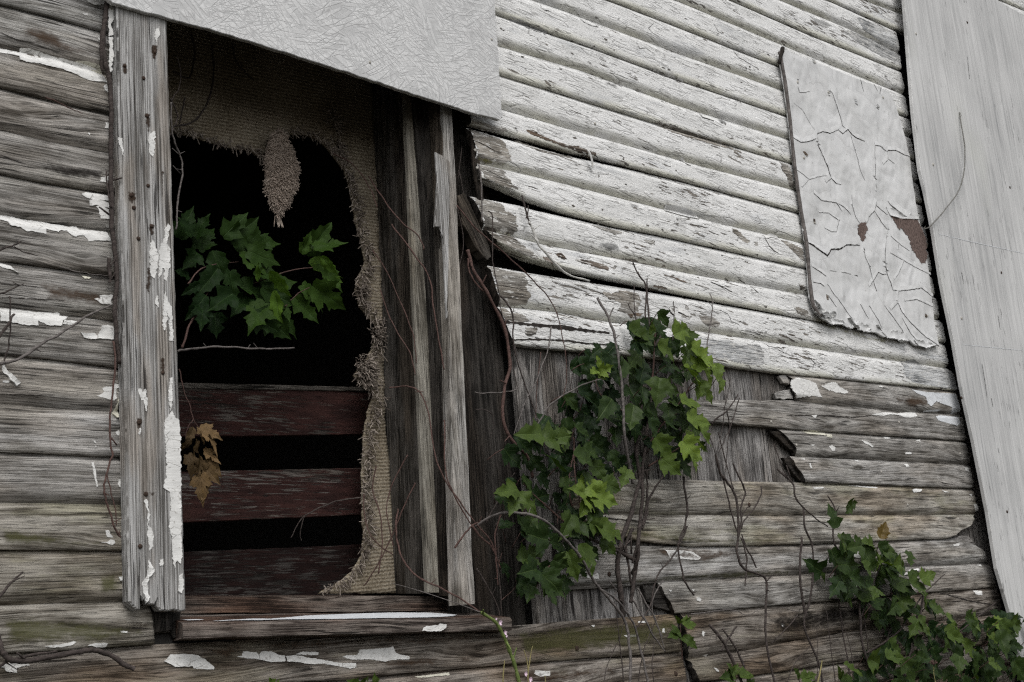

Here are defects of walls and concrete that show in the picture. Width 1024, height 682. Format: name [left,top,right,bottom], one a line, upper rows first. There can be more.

peeling [0,0,114,92]
peeling [468,120,600,189]
peeling [655,120,734,150]
peeling [0,176,111,241]
peeling [470,197,616,270]
crack [793,86,939,346]
peeling [0,308,114,340]
peeling [488,267,538,336]
peeling [790,284,961,426]
peeling [142,377,184,603]
peeling [164,654,214,669]
peeling [237,646,410,669]